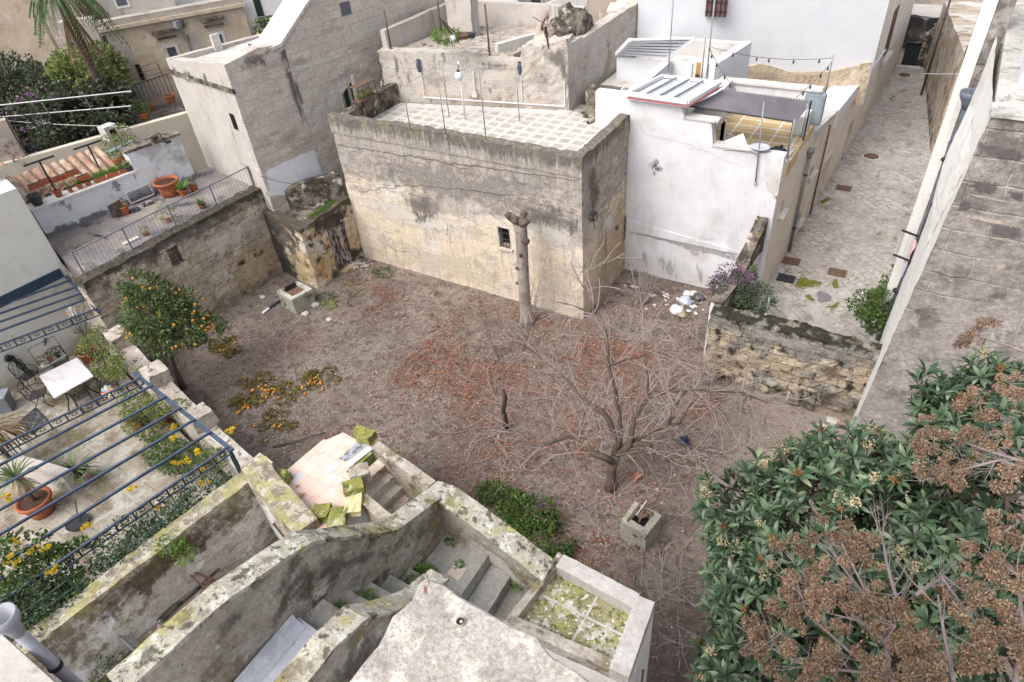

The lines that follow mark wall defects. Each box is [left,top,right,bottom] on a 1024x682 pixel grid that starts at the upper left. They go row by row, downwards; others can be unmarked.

leakage [359,160,551,222]
crack [327,142,584,217]
leakage [589,167,599,208]
leakage [94,501,236,624]
leakage [336,637,382,682]